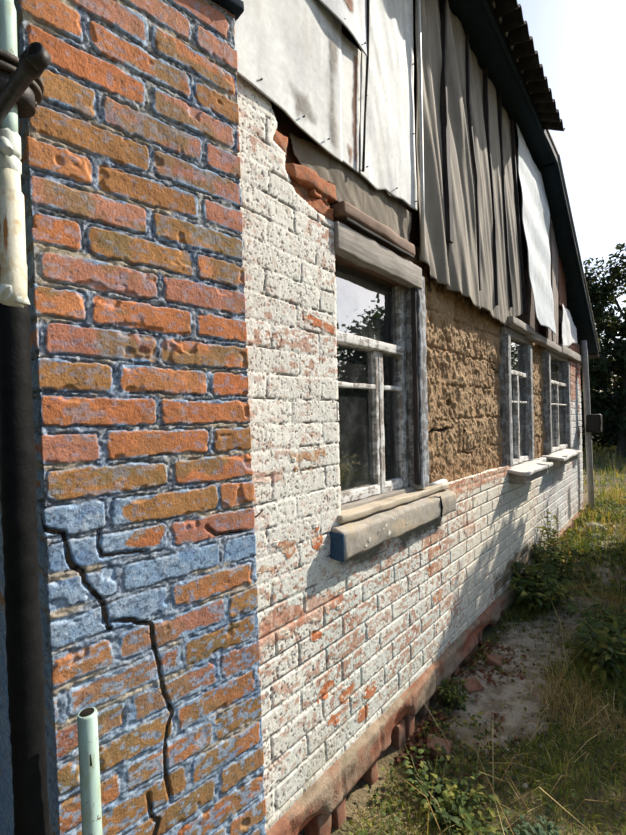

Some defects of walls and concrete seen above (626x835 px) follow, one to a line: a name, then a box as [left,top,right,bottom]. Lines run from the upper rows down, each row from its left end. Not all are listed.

spalling [273,130,337,222]
peeling [302,310,334,335]
peeling [570,344,580,402]
peeling [252,470,283,484]
peeling [289,448,326,472]
peeling [272,540,297,559]
peeling [311,523,324,550]
peeling [421,531,443,577]
peeling [258,590,343,652]
crack [41,513,176,835]
peeling [316,680,354,727]
peeling [355,681,377,722]